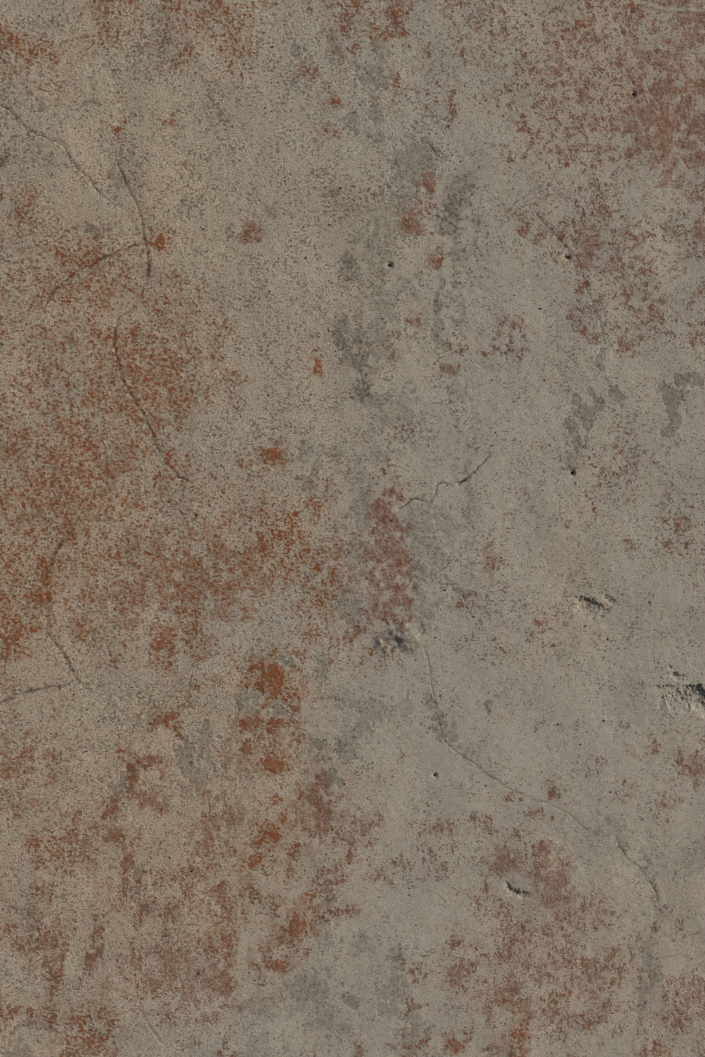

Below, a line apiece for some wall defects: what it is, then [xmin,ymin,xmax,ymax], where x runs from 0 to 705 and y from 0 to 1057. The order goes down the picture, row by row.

corrosion [0,0,269,79]
corrosion [0,188,390,785]
corrosion [0,710,64,817]
corrosion [26,810,92,905]
corrosion [196,794,323,1010]
corrosion [446,1030,472,1054]
corrosion [484,1013,533,1057]